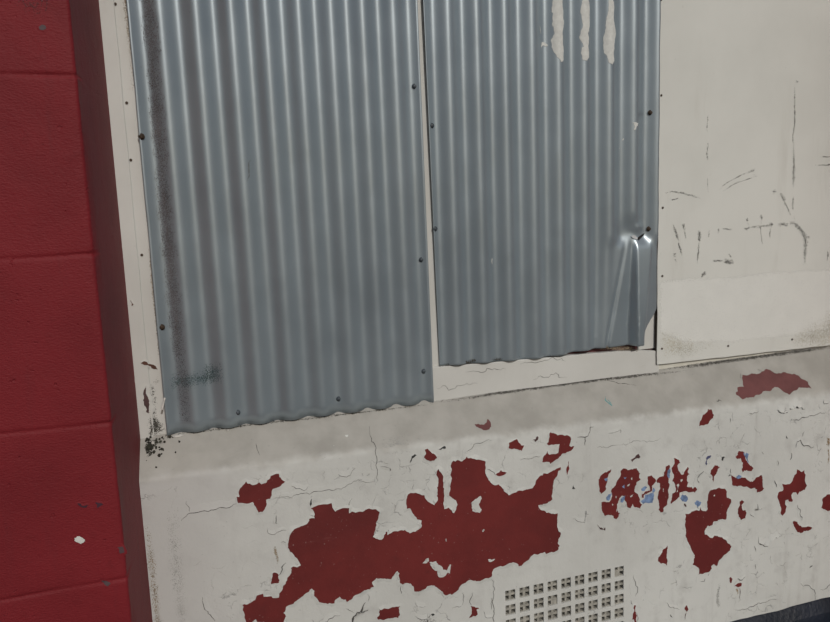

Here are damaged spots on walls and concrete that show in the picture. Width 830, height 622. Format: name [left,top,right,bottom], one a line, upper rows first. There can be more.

peeling [733,366,813,414]
crack [762,401,829,487]
crack [181,499,235,521]
crack [267,426,391,535]
peeling [234,429,576,622]
peeling [595,449,766,577]
peeling [776,467,813,535]
peeling [820,491,830,514]
crack [319,594,370,622]
crack [452,579,497,622]